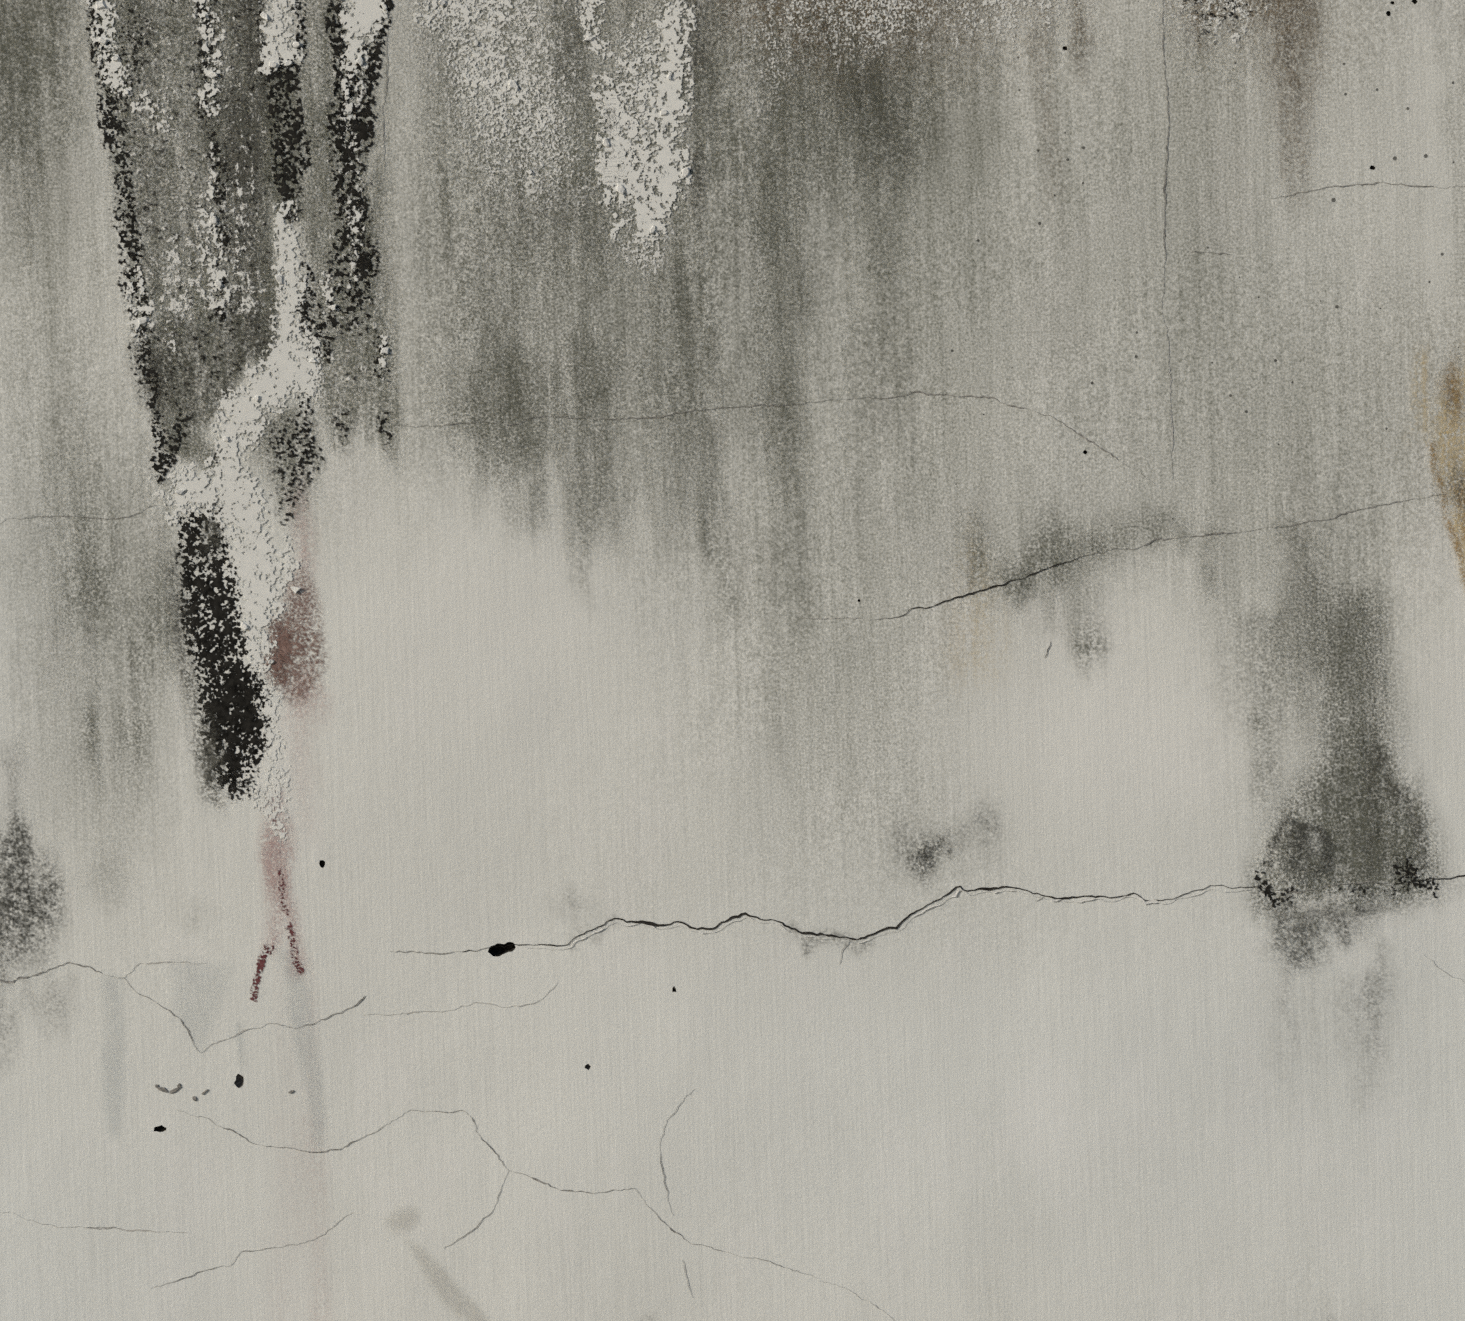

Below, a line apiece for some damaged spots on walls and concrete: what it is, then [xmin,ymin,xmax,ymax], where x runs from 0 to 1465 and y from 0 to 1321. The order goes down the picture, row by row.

damp [0,0,67,172]
damp [1180,0,1310,88]
damp [85,0,398,525]
damp [426,0,952,473]
damp [129,503,274,801]
crack [798,493,1448,620]
rust [1423,378,1465,577]
damp [1253,583,1440,963]
crack [0,961,557,1051]
crack [392,875,1465,961]
crack [3,1212,186,1233]
crack [178,1094,888,1315]